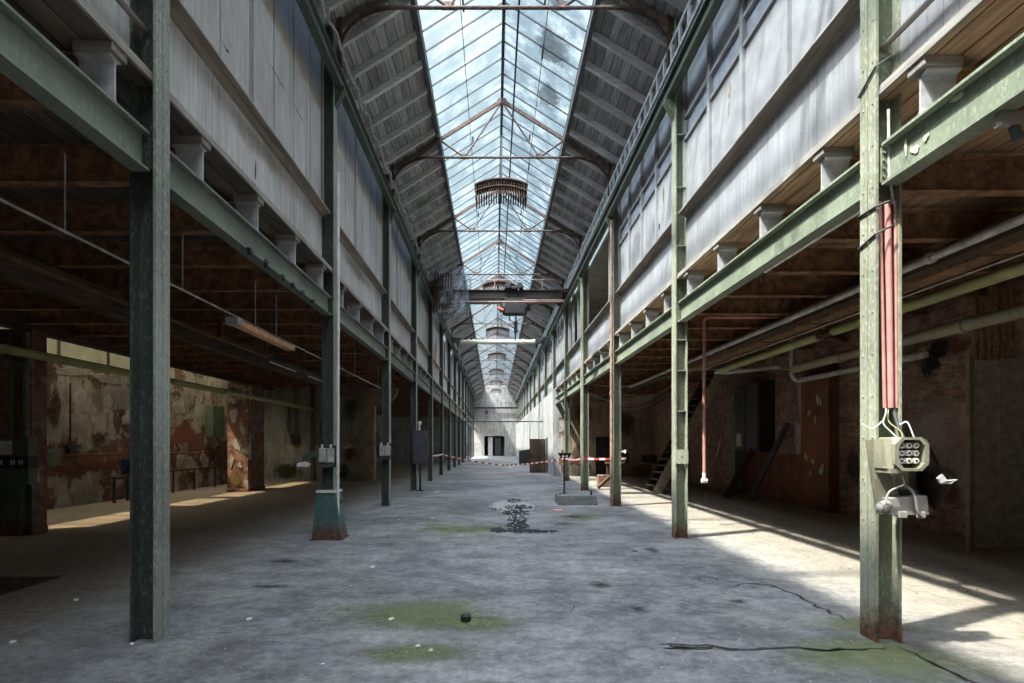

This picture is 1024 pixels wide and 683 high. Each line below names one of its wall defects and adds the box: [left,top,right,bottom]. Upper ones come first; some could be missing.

flaking render [57,367,130,435]
flaking render [170,420,209,474]
flaking render [230,391,246,469]
crack [697,577,853,624]